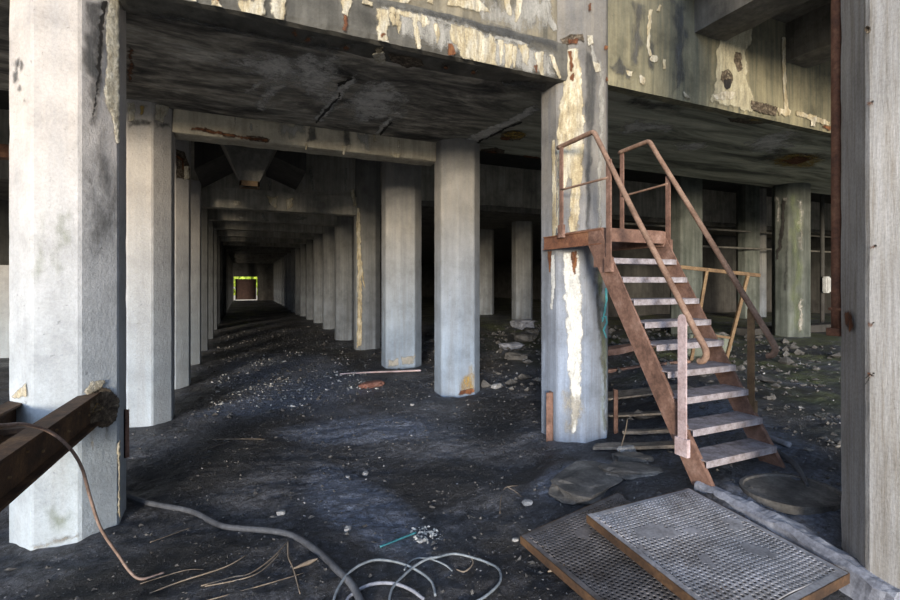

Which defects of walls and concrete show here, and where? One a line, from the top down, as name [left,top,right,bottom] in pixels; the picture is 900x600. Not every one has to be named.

spalling [382,7,594,48]
peeling [104,0,169,143]
spalling [372,40,424,68]
peeling [710,28,777,124]
crack [314,77,355,123]
spalling [796,111,831,131]
corrosion [459,376,475,395]